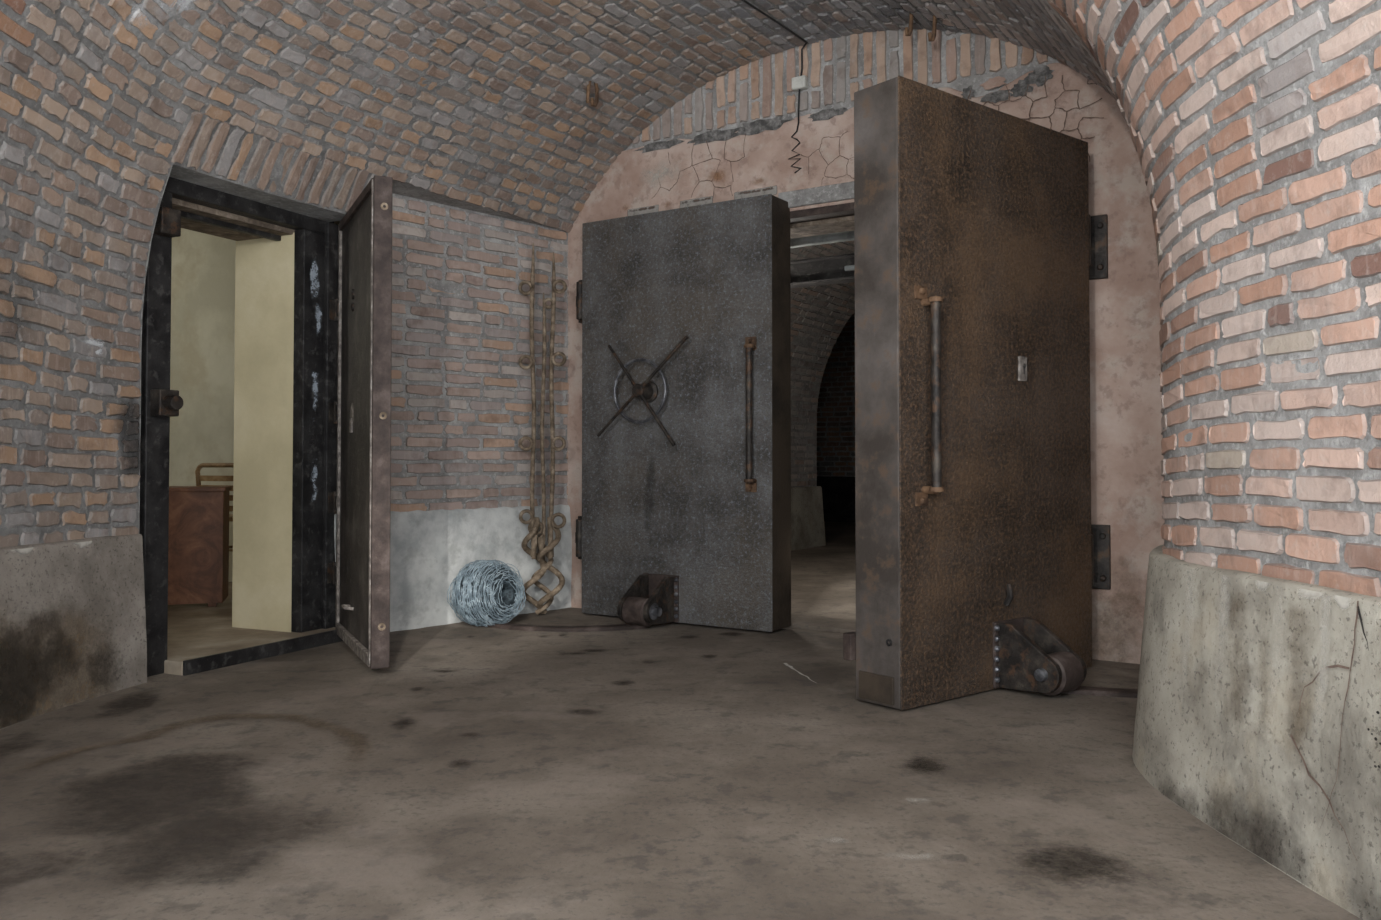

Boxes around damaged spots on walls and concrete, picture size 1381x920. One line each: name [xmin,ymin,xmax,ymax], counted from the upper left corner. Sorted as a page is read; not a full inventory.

leakage [0,615,153,729]
crack [1290,601,1369,860]
leakage [71,755,278,879]